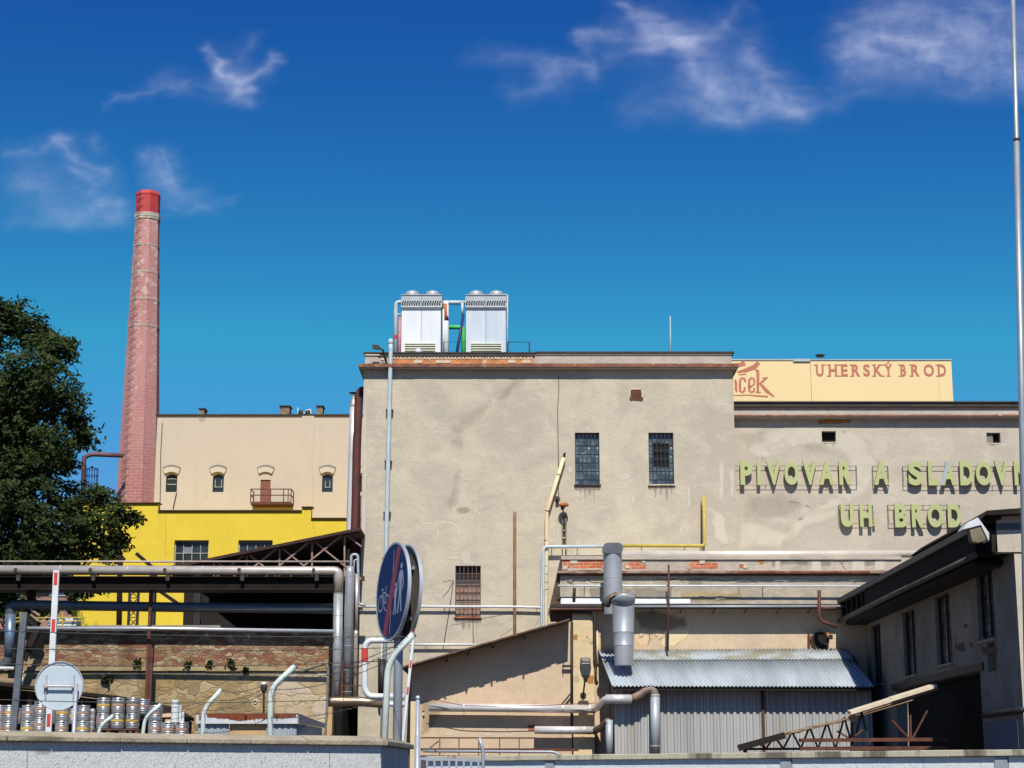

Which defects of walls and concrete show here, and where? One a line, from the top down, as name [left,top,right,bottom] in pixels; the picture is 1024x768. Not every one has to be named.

flaking render [380,356,535,365]
efflorescence [712,462,734,545]
flaking render [623,561,646,569]
flaking render [688,560,718,569]
flaking render [563,560,603,581]